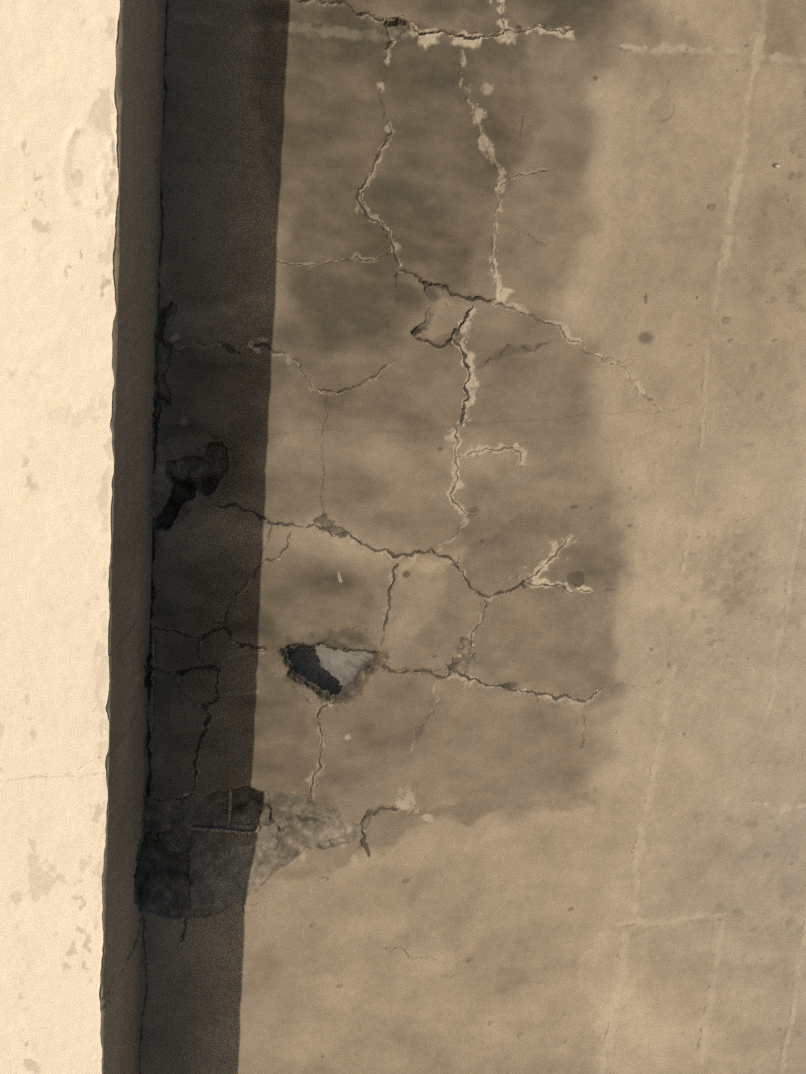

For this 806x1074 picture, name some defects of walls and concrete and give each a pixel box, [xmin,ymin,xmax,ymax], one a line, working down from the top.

hole [149,417,247,534]
leakage [144,0,675,886]
crack [142,0,697,800]
hole [280,625,386,709]
spalling [133,784,378,922]
crack [356,784,436,860]
crack [105,914,151,1074]